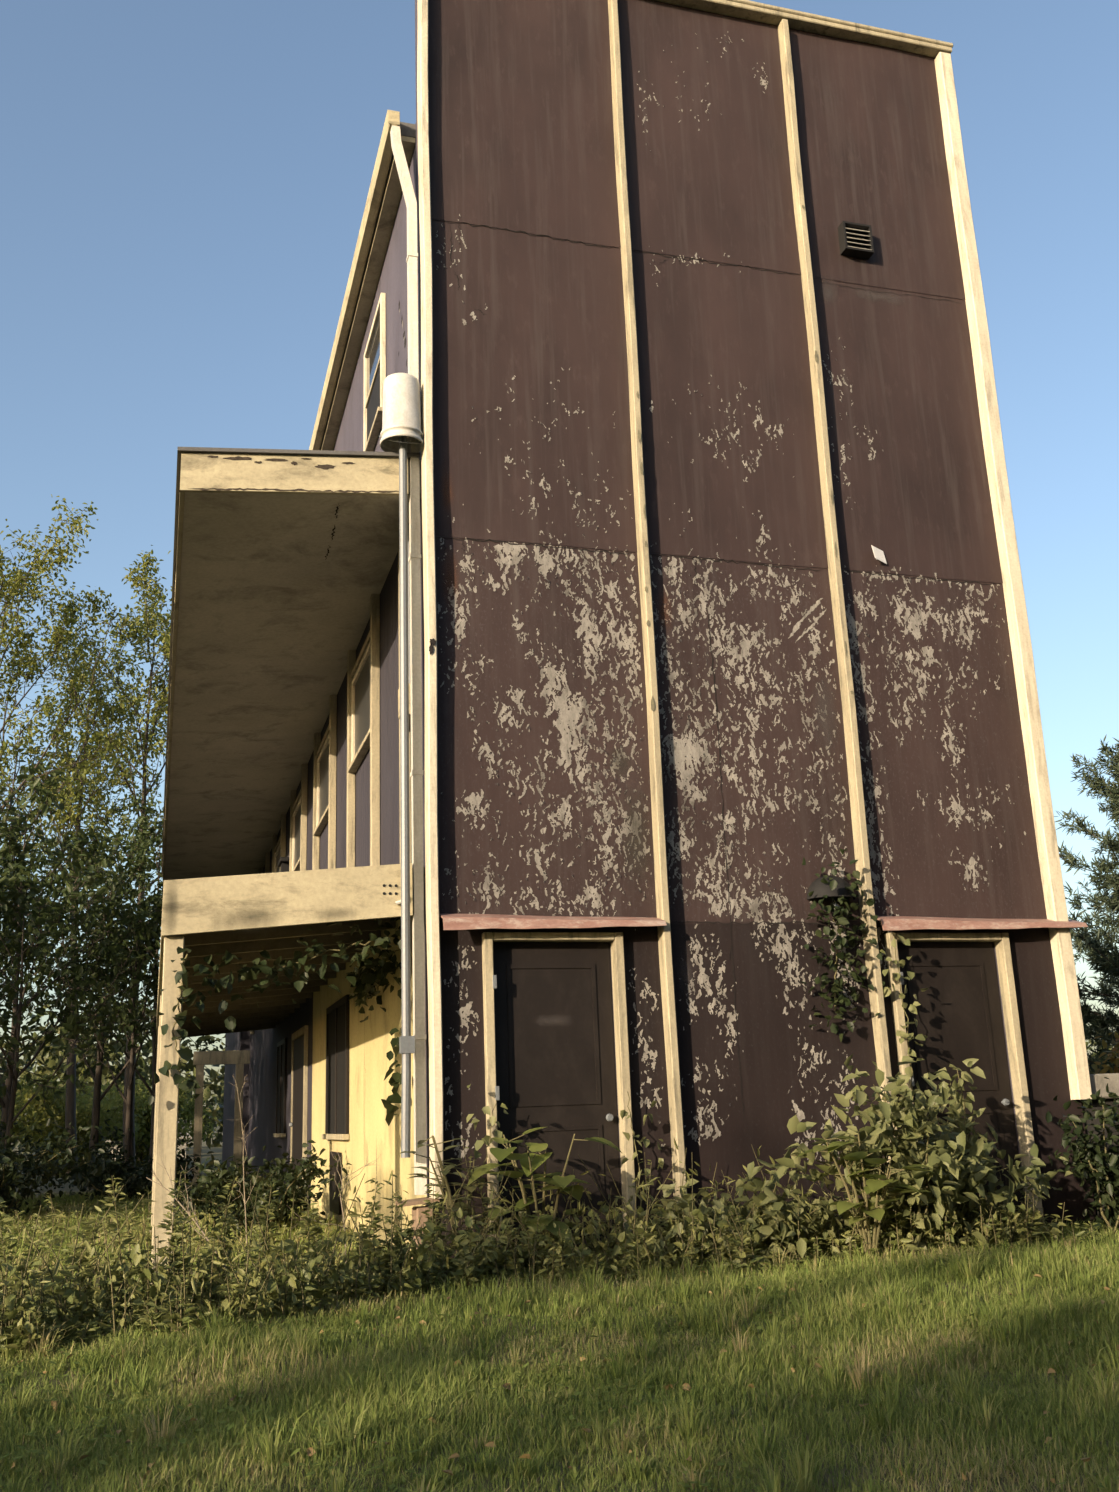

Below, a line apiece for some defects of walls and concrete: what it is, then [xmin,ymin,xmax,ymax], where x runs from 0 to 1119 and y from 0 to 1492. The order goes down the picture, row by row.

peeling [436,214,488,325]
peeling [814,337,877,509]
peeling [429,367,1019,1163]